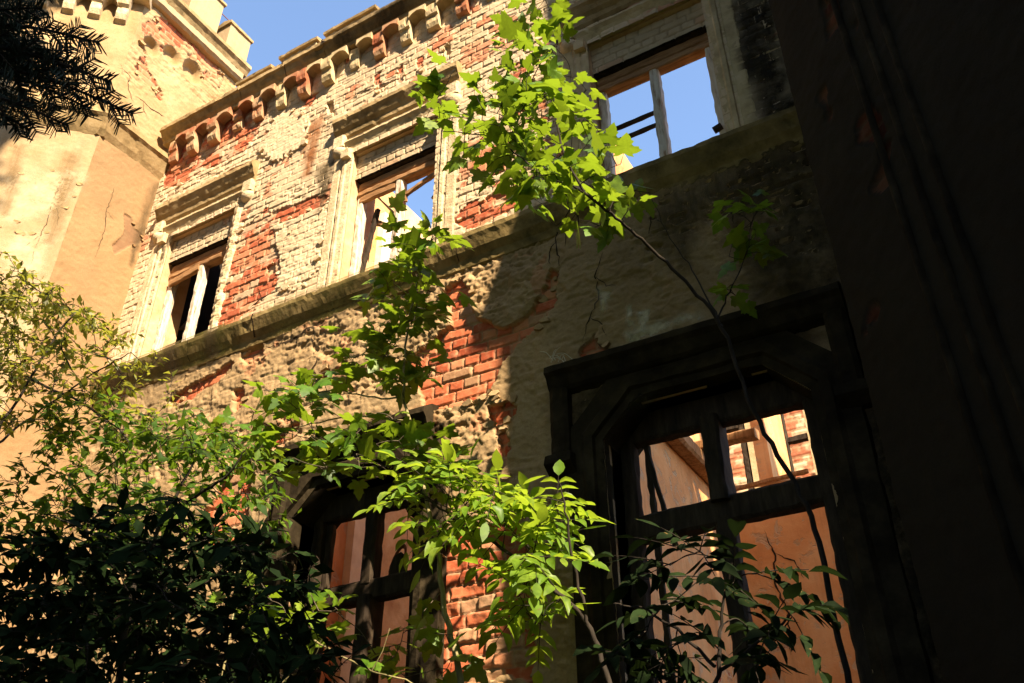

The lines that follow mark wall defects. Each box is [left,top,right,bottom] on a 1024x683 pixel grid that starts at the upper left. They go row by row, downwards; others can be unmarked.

water stain [740,11,761,78]
spalling [112,214,144,255]
spalling [218,195,328,326]
crack [583,252,610,338]
spalling [170,348,266,406]
spalling [411,269,559,481]